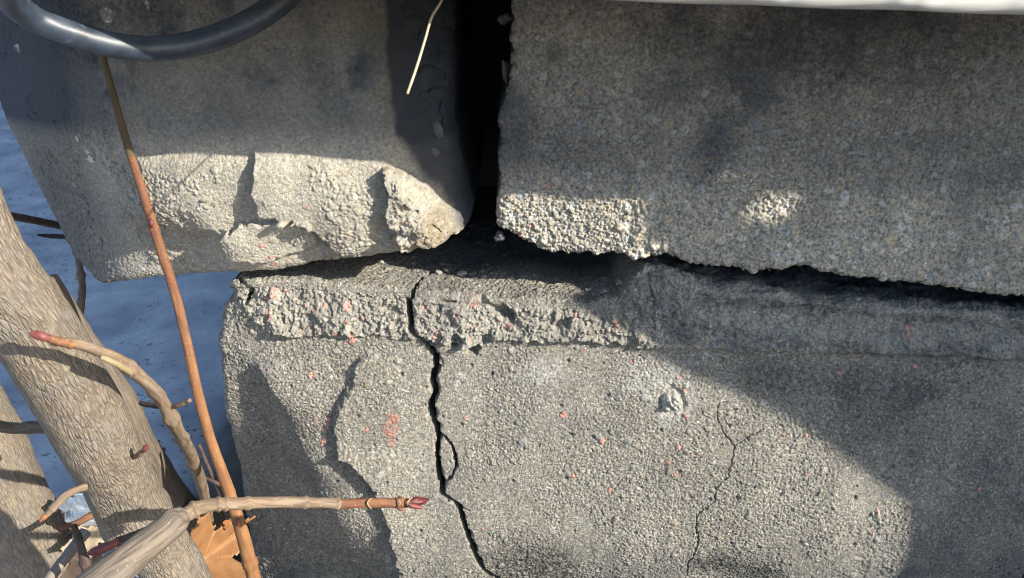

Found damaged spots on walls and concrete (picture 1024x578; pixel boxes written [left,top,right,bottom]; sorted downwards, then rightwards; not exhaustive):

crack [406,298,414,326]
spalling [224,275,668,355]
crack [429,345,477,547]